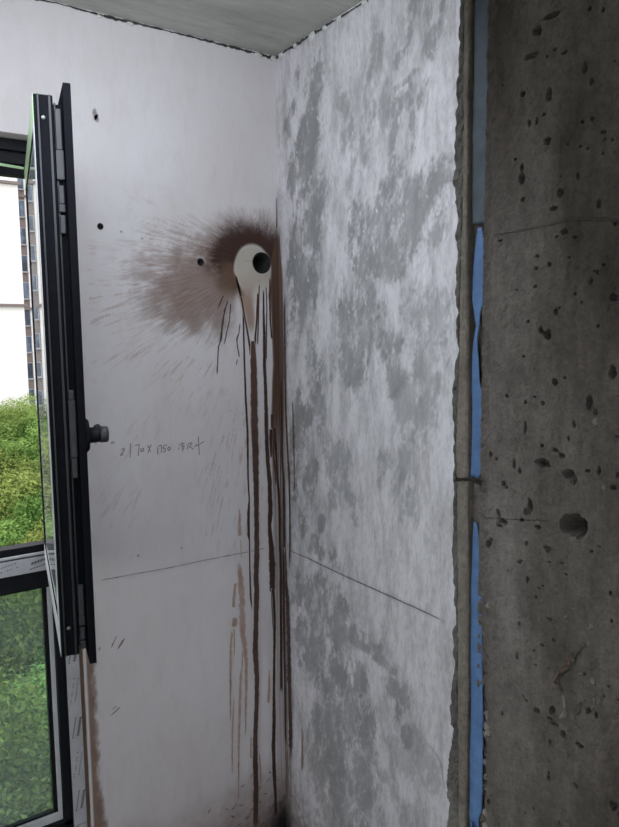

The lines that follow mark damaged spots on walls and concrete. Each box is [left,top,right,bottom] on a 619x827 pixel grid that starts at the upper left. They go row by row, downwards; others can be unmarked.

water stain [86,180,304,827]